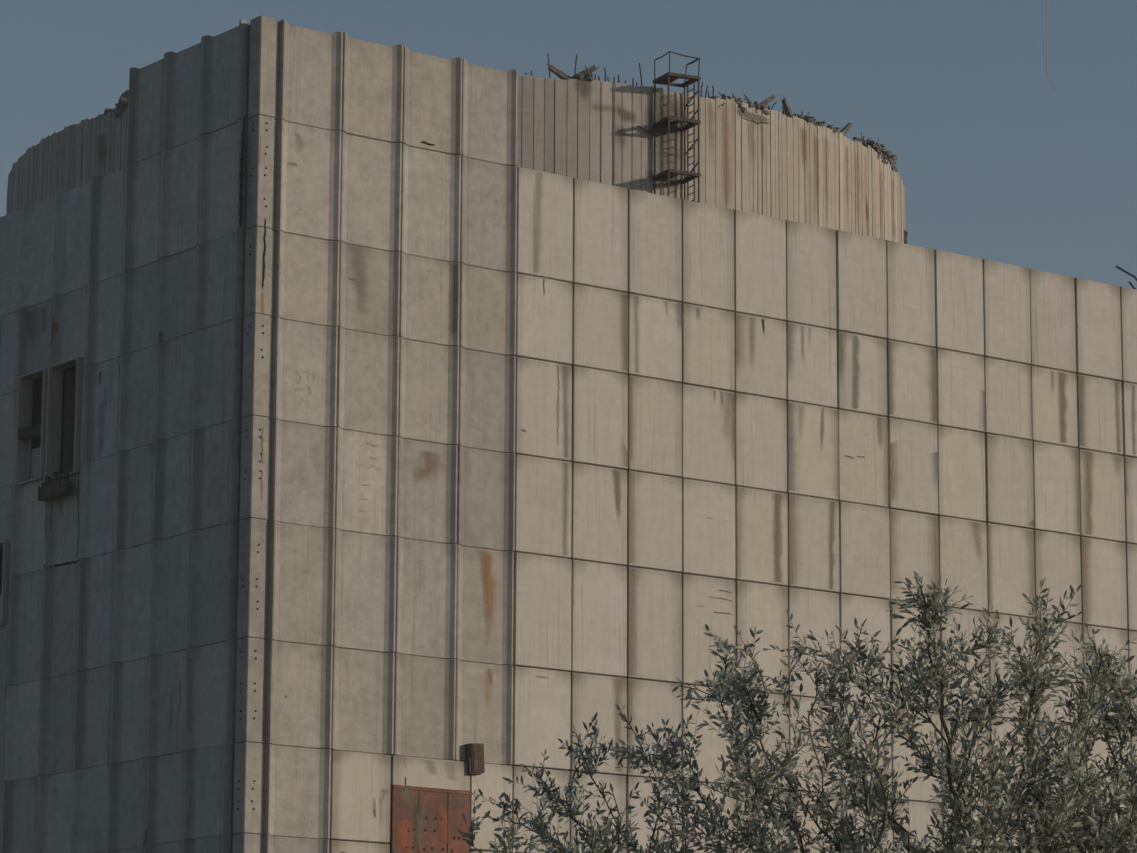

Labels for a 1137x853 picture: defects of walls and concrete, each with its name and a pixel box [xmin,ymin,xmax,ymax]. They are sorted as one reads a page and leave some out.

spalling [738,110,769,124]
crack [239,117,266,312]
damp [839,333,859,408]
corrosion [485,556,493,620]
damp [615,295,634,772]
damp [775,403,793,583]
damp [1060,372,1091,621]